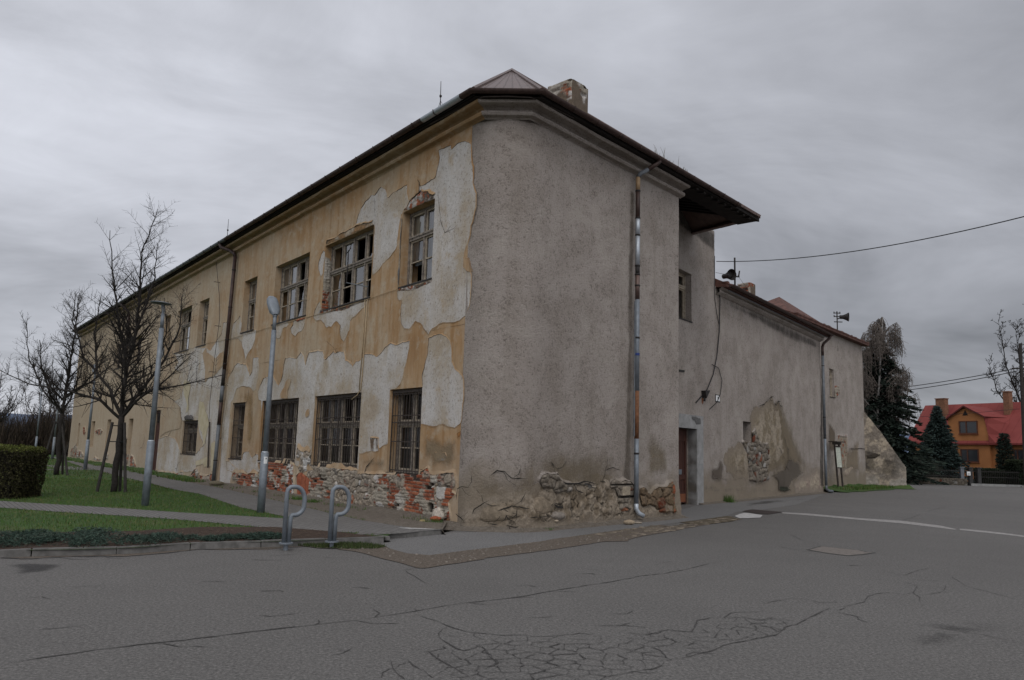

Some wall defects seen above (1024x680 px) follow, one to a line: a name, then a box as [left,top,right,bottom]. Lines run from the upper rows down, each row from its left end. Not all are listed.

flaking render [156,140,682,528]
flaking render [724,398,784,486]
crack [455,460,619,529]